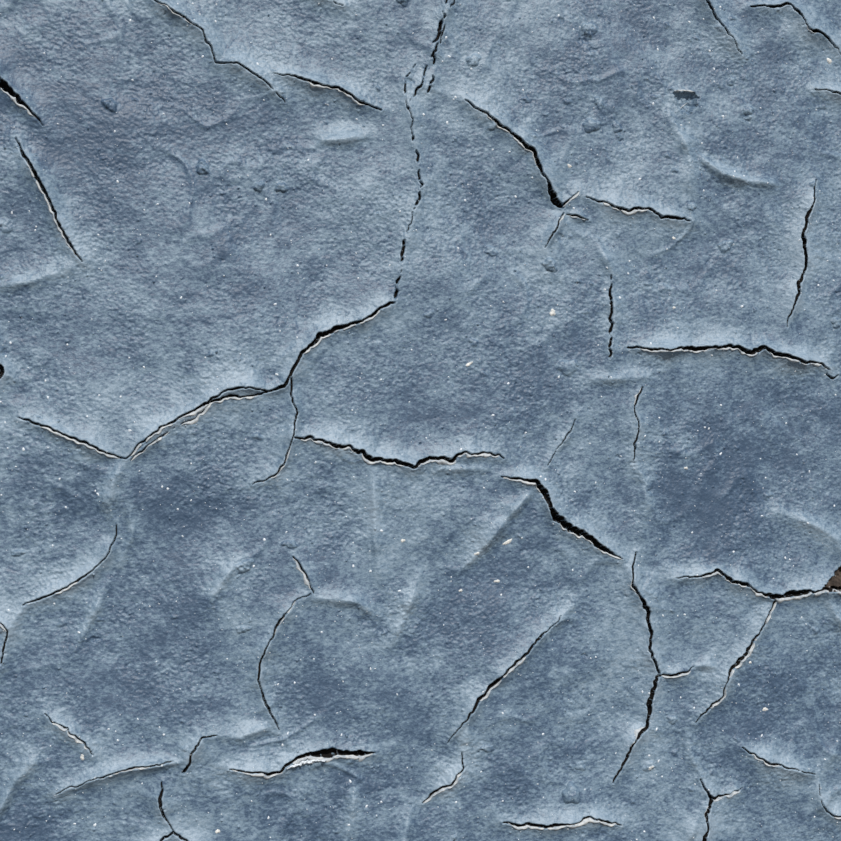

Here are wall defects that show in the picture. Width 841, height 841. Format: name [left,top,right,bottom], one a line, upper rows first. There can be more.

crack [691,0,841,60]
crack [602,175,841,384]
crack [0,0,695,805]
crack [669,563,841,726]
spalling [821,566,841,592]
crack [40,709,219,841]